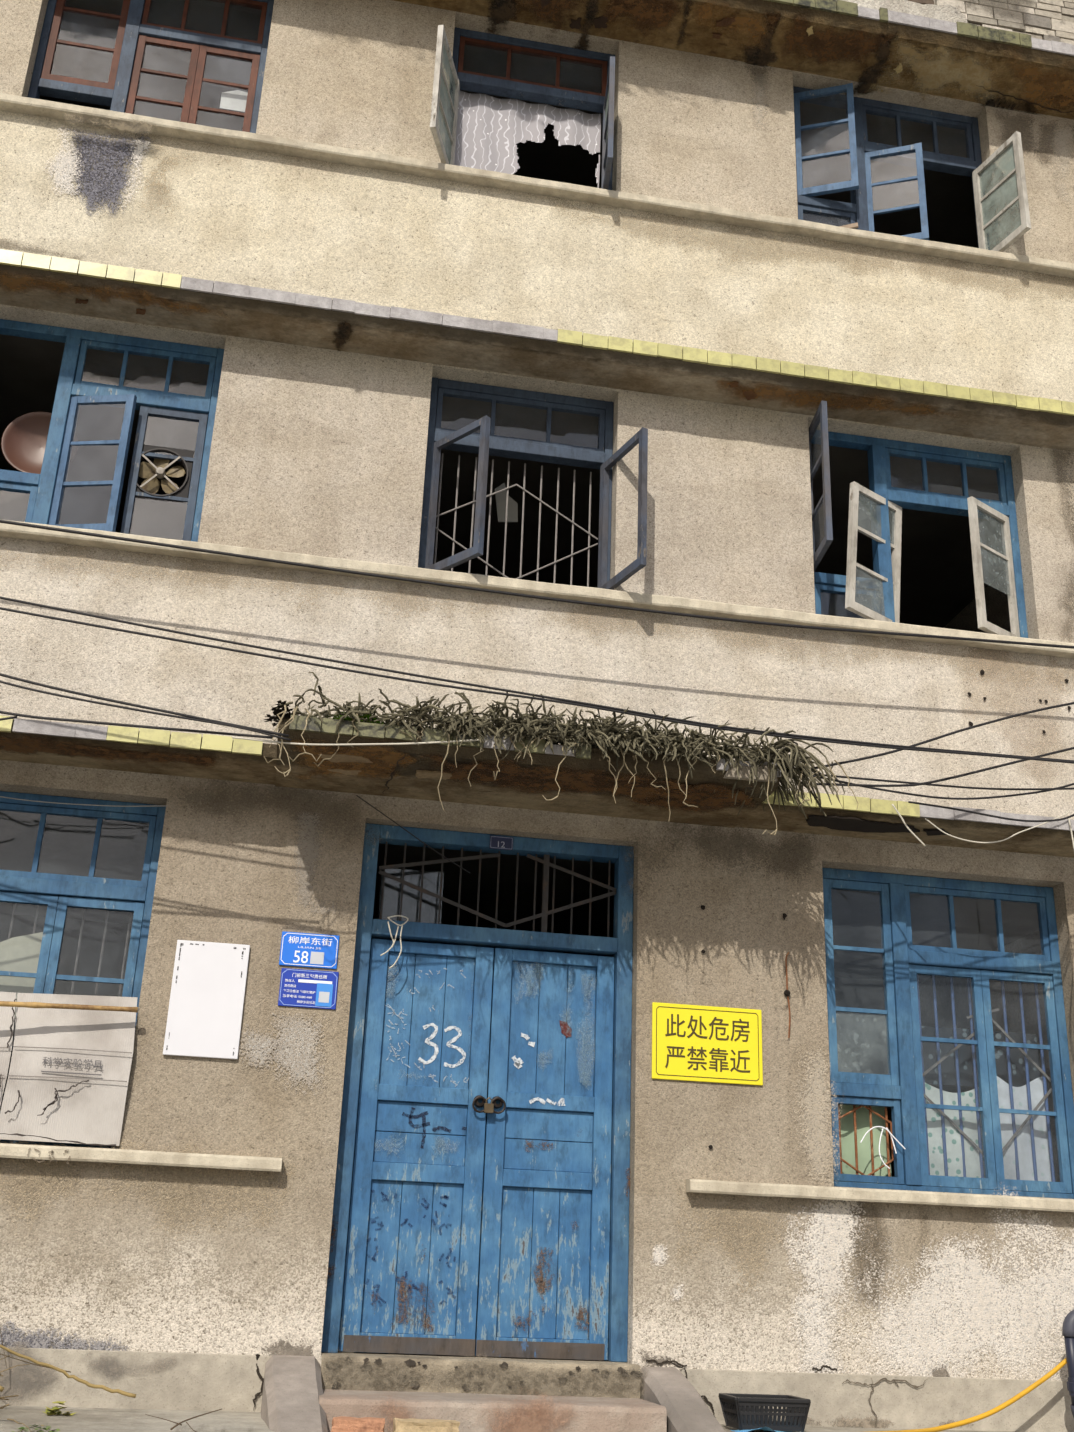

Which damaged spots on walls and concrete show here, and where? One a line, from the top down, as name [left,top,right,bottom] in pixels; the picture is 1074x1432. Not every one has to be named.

damp [487,0,516,34]
damp [573,0,599,51]
flaking render [907,0,1074,45]
damp [45,113,153,216]
damp [793,1049,838,1180]
damp [784,1190,1074,1380]
crack [842,1378,926,1424]